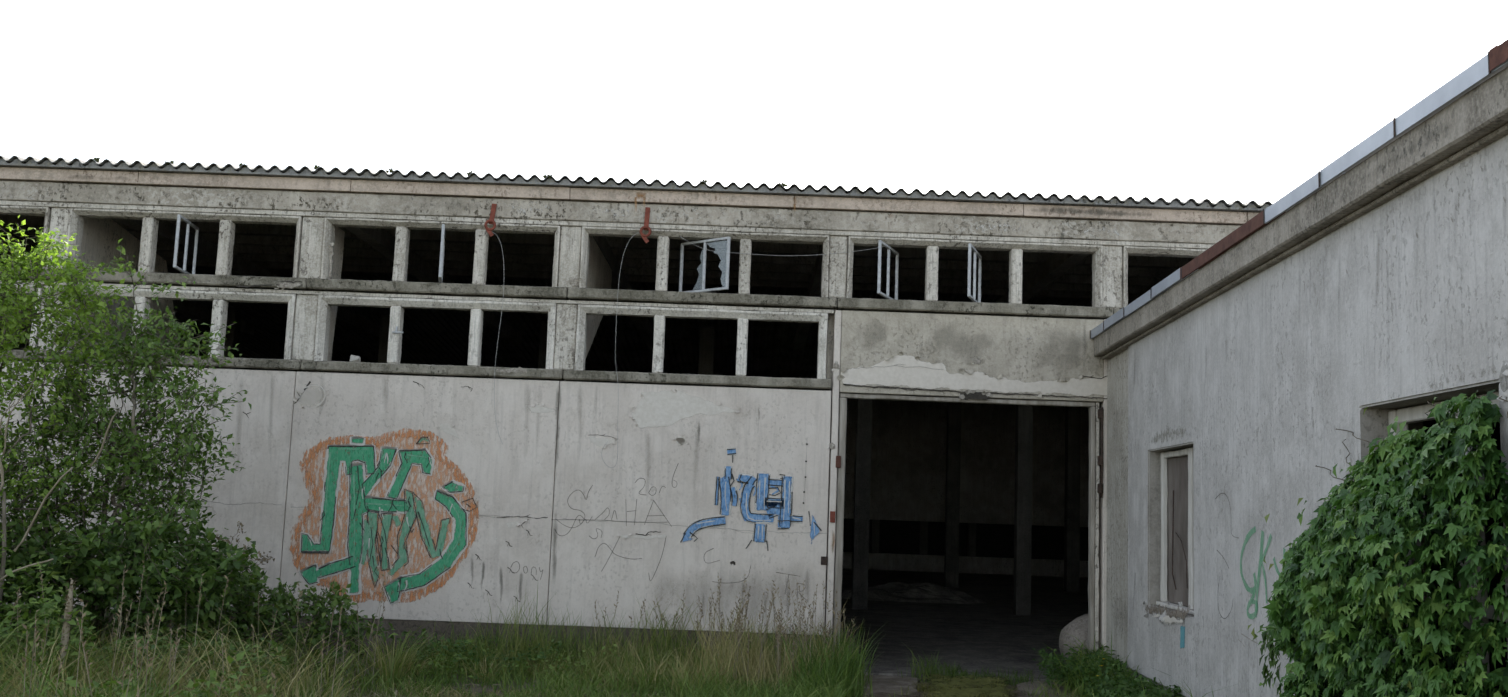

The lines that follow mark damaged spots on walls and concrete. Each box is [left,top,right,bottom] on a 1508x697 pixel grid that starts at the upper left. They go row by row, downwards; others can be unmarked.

peeling [831,352,1107,400]